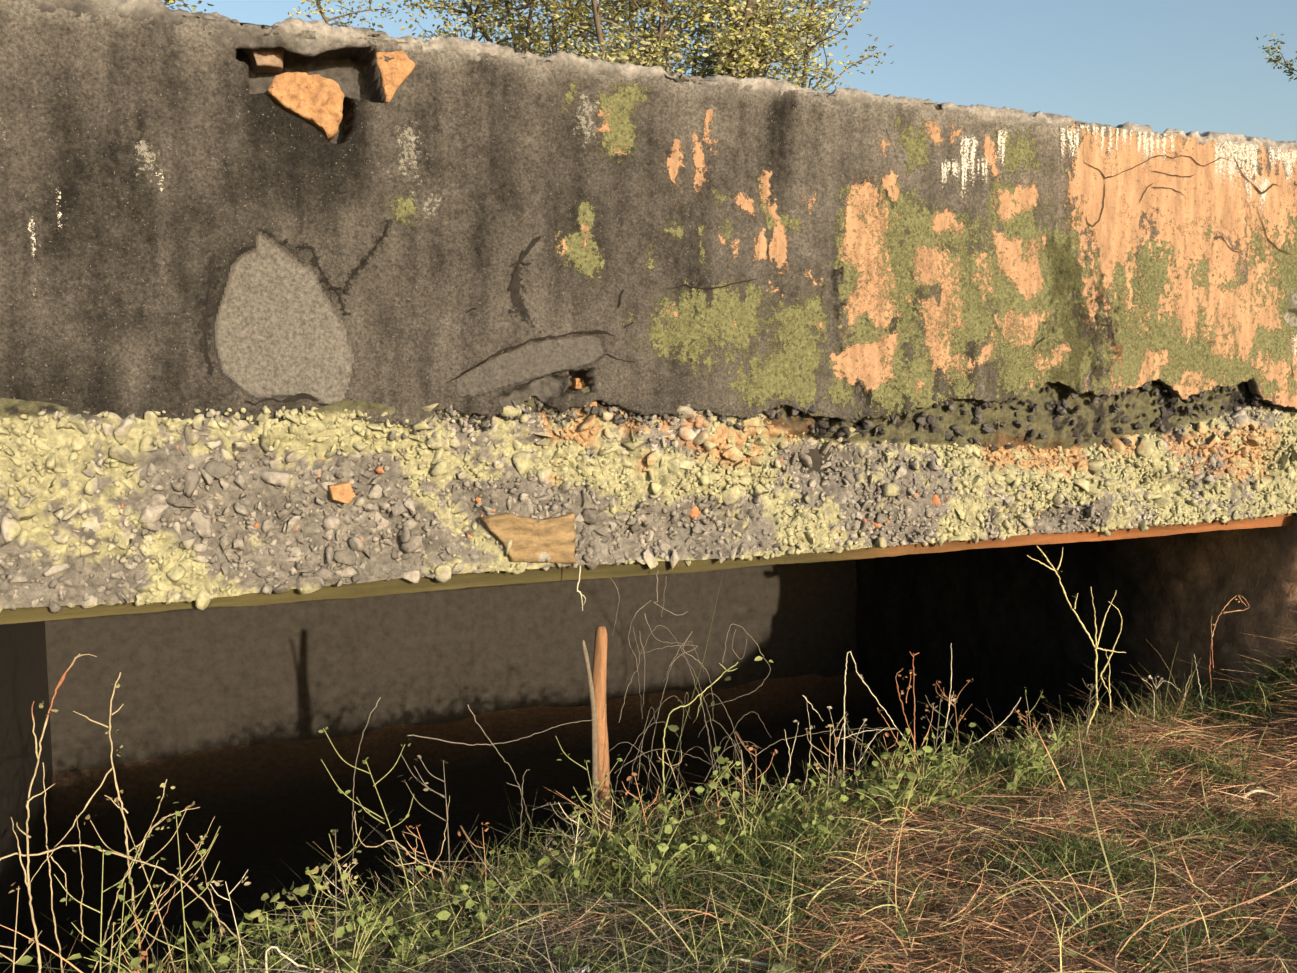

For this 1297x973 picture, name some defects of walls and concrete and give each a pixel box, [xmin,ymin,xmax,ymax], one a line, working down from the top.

spalling [236,47,415,144]
flaking render [596,110,627,155]
flaking render [664,109,719,204]
flaking render [925,120,964,146]
water stain [941,130,1007,199]
water stain [1060,124,1175,161]
crack [1083,144,1297,255]
water stain [1213,141,1297,210]
crack [508,236,541,292]
crack [446,289,634,383]
crack [515,369,571,387]
spalling [0,124,1297,613]